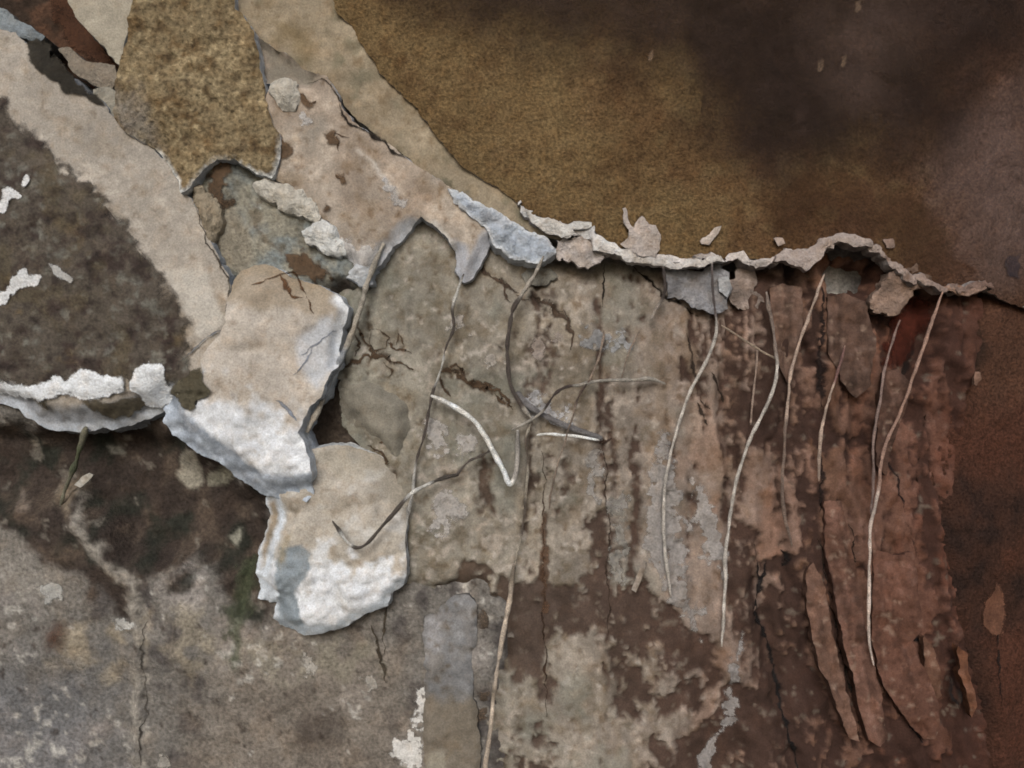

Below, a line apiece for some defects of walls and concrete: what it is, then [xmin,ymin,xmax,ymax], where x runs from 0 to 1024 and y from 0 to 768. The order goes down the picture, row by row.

spalling [327,77,374,134]
damp [449,0,1024,168]
damp [0,97,193,408]
corrosion [481,266,574,350]
corrosion [881,297,931,368]
spalling [66,411,166,434]
spalling [306,200,1024,768]
damp [40,583,63,605]
damp [115,618,134,631]
crack [371,606,387,682]
corrosion [539,513,549,613]
corrosion [983,584,1005,636]